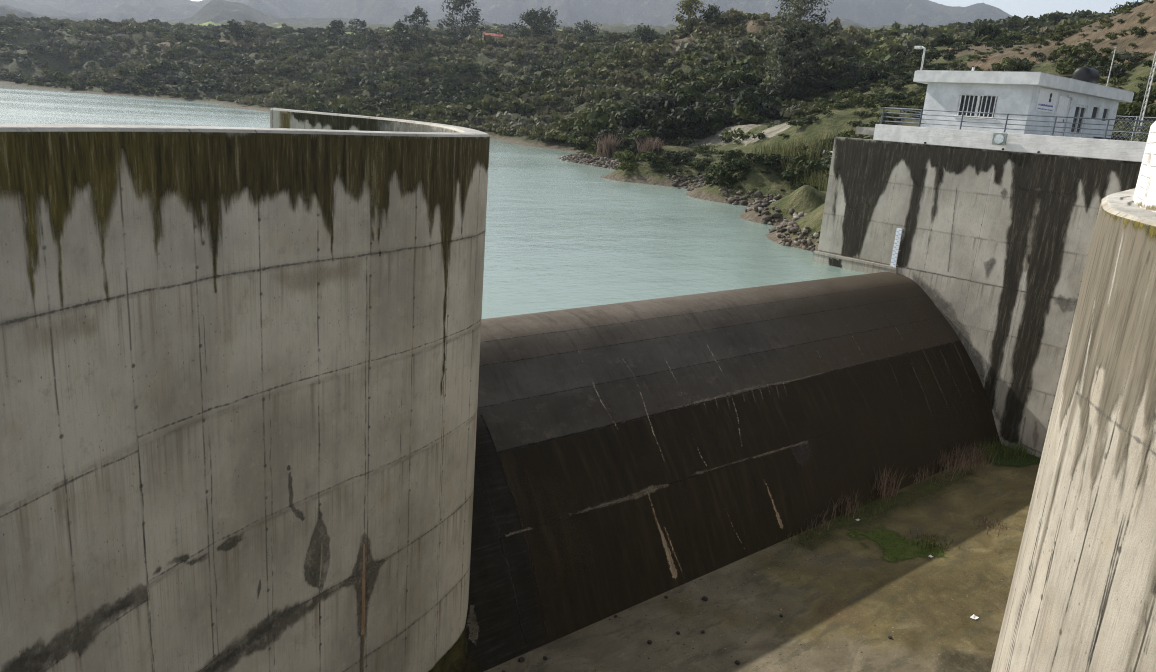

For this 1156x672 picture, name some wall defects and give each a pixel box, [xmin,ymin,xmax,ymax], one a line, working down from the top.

damp [0,111,490,395]
damp [828,137,1156,498]
damp [201,465,385,672]